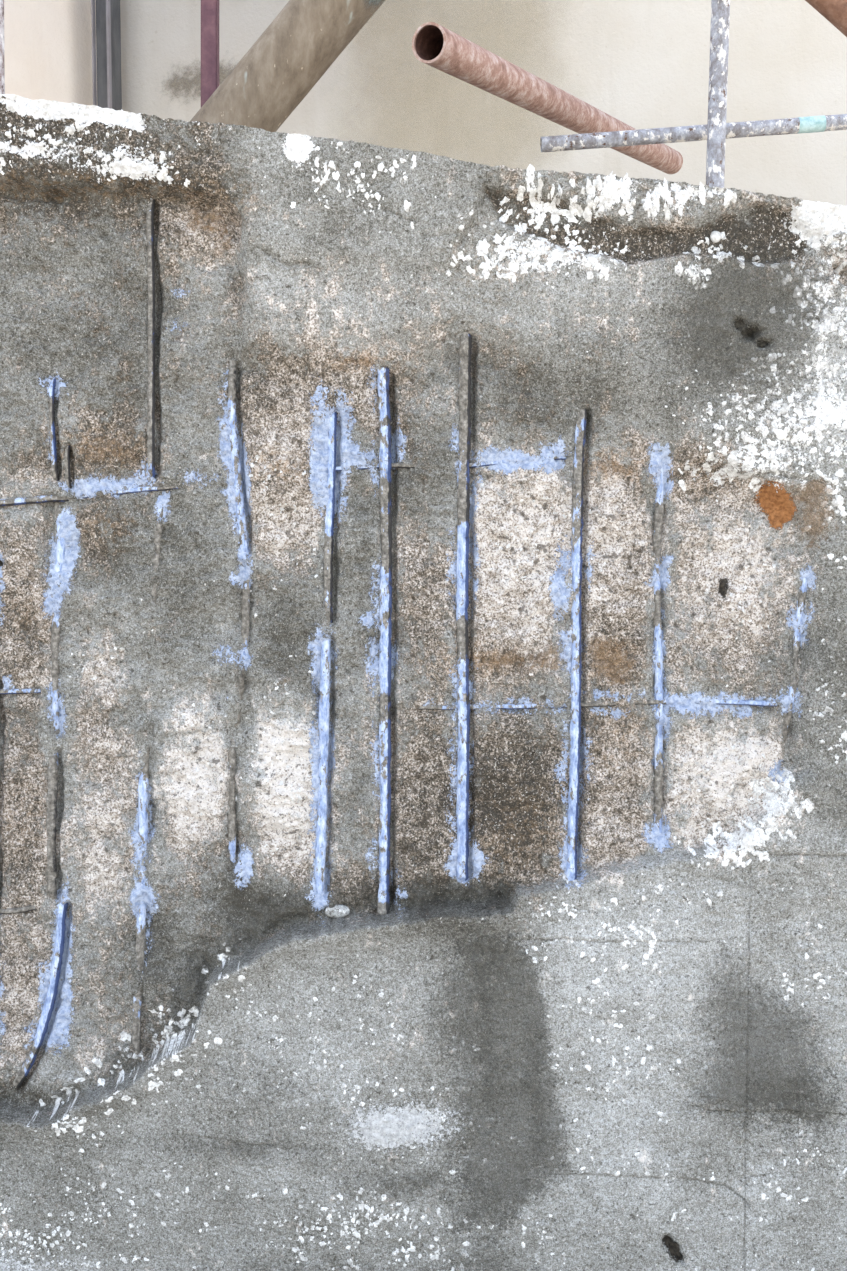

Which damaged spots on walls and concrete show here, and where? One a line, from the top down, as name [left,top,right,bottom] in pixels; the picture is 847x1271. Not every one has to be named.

peeling [281,133,417,215]
peeling [809,678,846,720]
peeling [525,878,684,1112]
peeling [768,967,847,1008]
peeling [191,1030,222,1061]
peeling [276,1036,520,1179]
peeling [576,1135,641,1179]
peeling [0,1168,149,1271]
peeling [155,1173,230,1226]